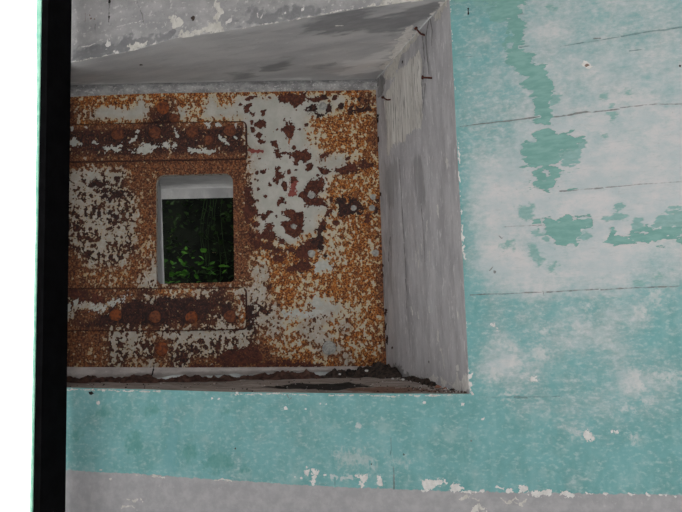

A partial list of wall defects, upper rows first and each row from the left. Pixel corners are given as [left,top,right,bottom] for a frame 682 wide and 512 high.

peeling [168,0,232,38]
peeling [71,39,156,62]
rust [268,91,372,121]
peeling [430,0,591,193]
crack [459,102,682,128]
rust [82,176,127,226]
rust [238,96,380,274]
peeling [527,202,682,248]
rust [69,288,256,331]
rust [190,345,322,368]
peeling [421,478,487,512]
peeling [495,485,575,507]